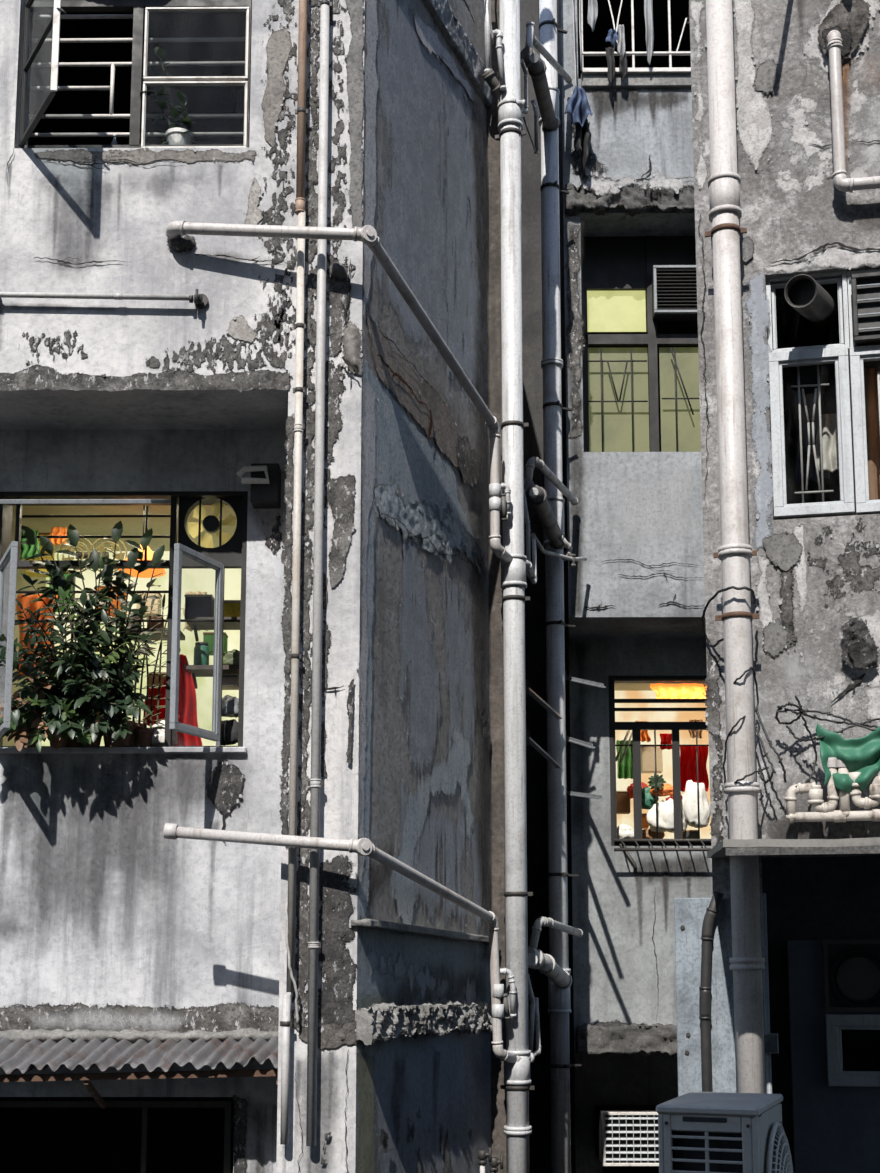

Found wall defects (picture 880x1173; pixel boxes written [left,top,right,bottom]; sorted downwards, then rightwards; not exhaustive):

peeling [570,0,709,196]
peeling [733,0,880,204]
spalling [740,236,755,262]
crack [772,242,880,263]
peeling [0,0,489,1173]
peeling [745,245,880,768]
crack [831,673,865,703]
water stain [4,756,212,916]